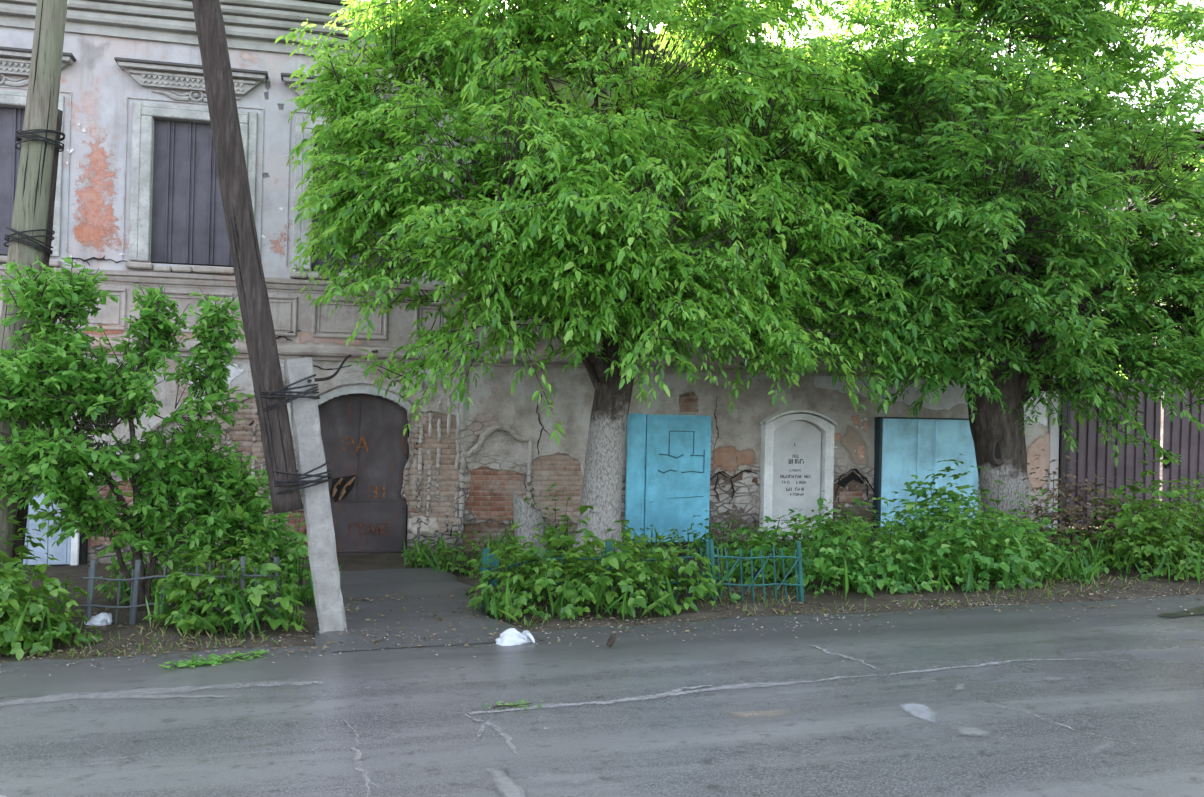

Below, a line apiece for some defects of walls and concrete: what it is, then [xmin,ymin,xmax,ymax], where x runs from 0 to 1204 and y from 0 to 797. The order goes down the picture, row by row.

peeling [63,123,129,262]
crack [536,395,551,461]
flaking render [677,389,701,414]
flaking render [401,409,584,552]
flaking render [709,469,759,541]
flaking render [833,415,874,536]
crack [82,692,229,700]
crack [646,685,713,698]
crack [883,659,1099,676]